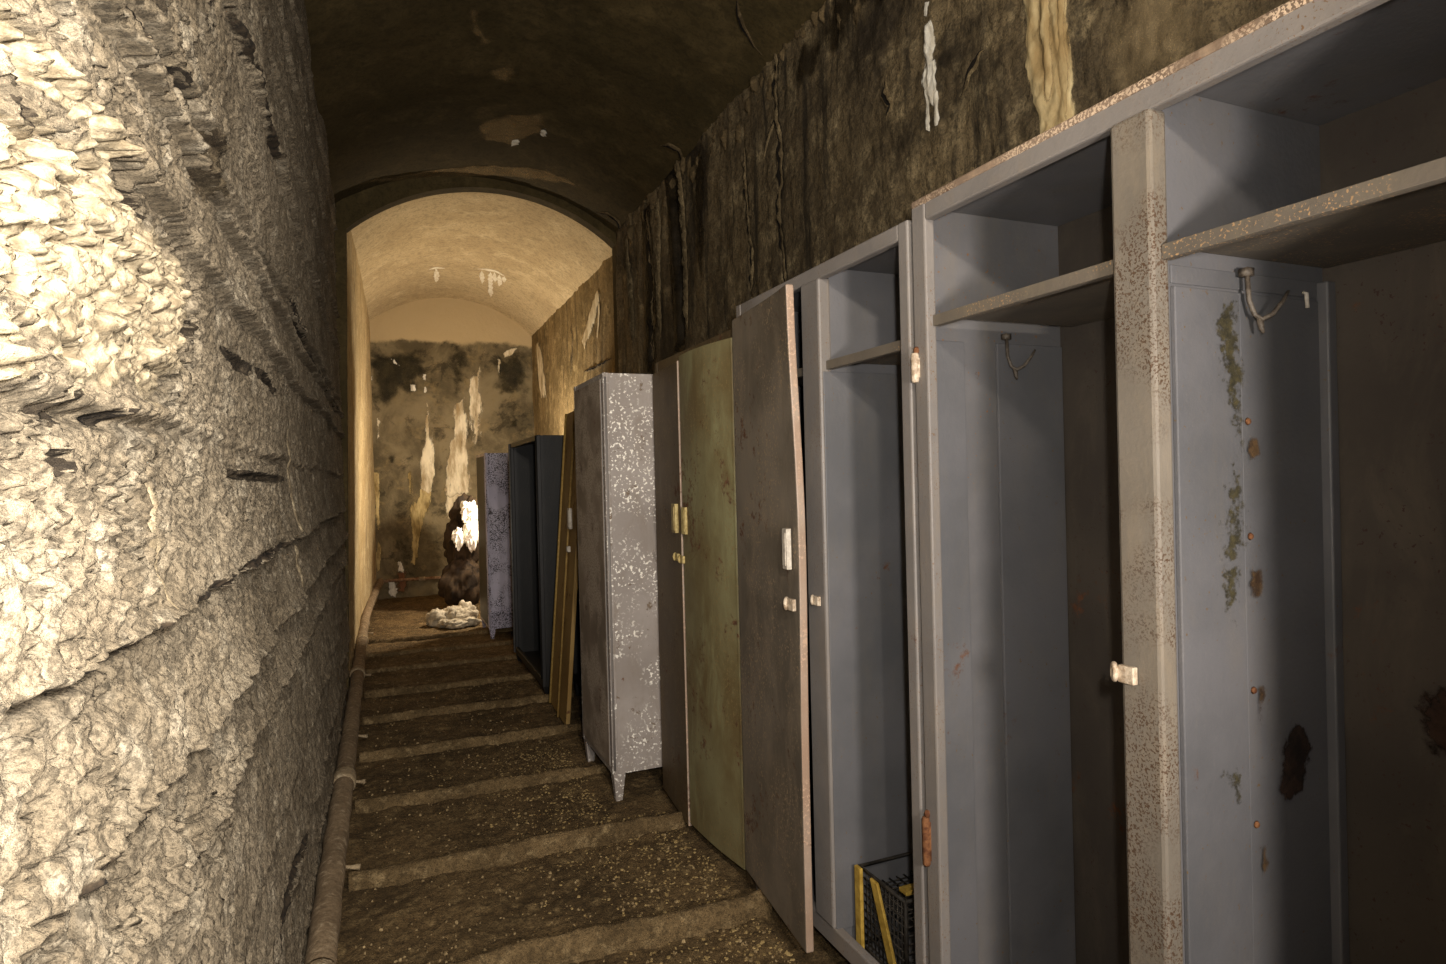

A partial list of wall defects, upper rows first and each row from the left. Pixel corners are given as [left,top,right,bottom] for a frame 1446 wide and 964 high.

water stain [922,1,939,131]
water stain [1023,0,1075,134]
water stain [372,350,422,402]
water stain [408,343,546,564]